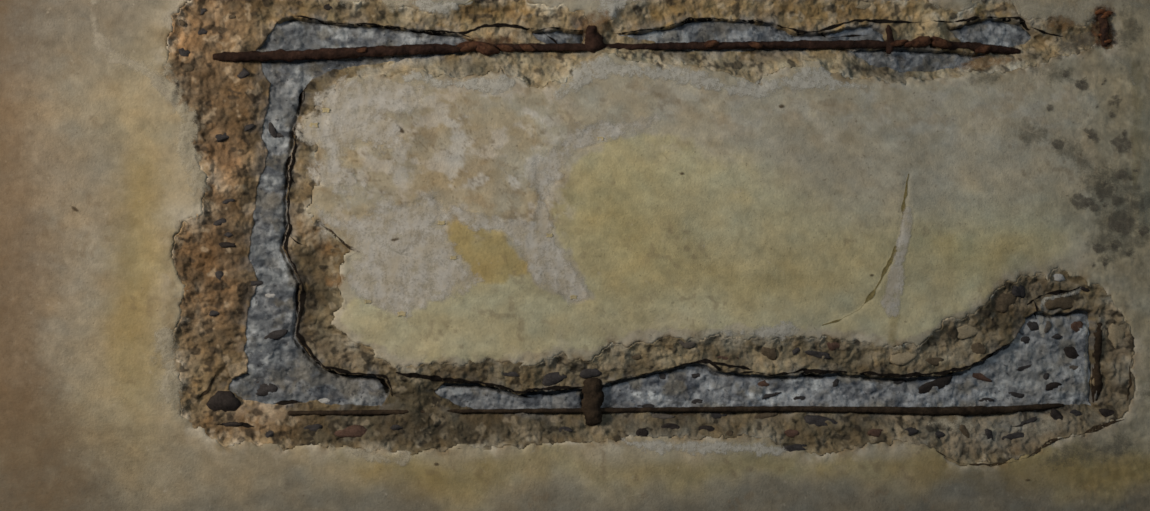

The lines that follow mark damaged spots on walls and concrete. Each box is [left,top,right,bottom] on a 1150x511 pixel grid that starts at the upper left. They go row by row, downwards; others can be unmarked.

crack [290,0,583,44]
crack [613,16,1063,38]
crack [282,85,1011,398]
spalling [164,0,1135,466]
spalling [1071,182,1150,235]
crack [1027,287,1080,318]
crack [936,326,1133,466]